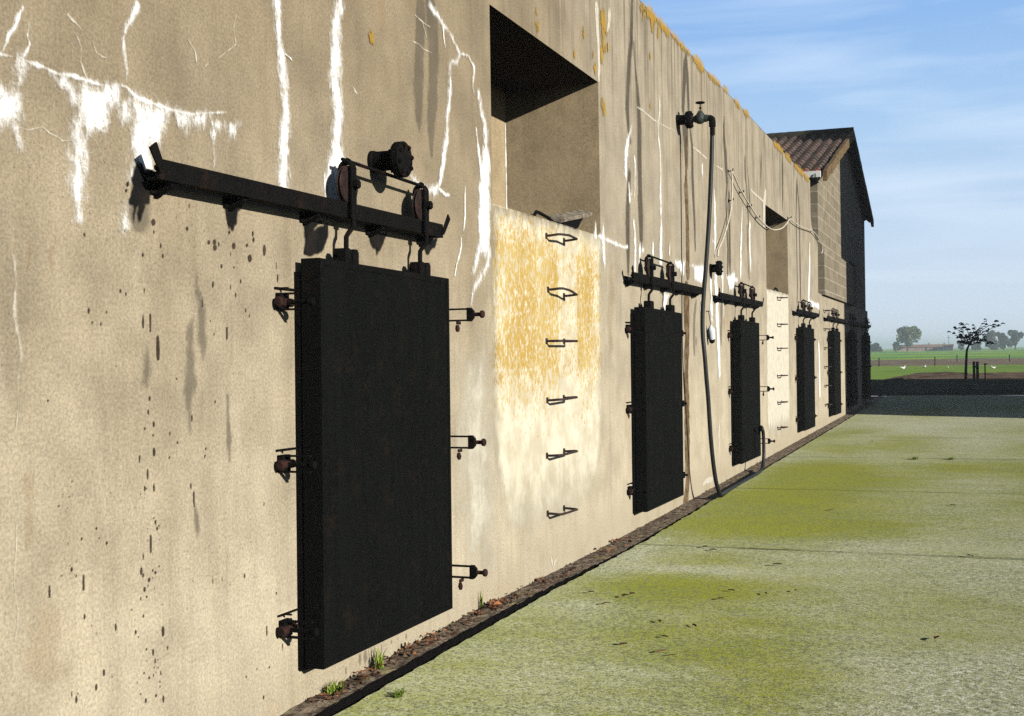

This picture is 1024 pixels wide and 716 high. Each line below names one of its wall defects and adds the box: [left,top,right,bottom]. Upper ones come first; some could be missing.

leakage [0,85,21,141]
leakage [17,58,236,236]
leakage [204,230,266,262]
leakage [273,0,292,188]
leakage [324,0,344,200]
leakage [472,91,491,297]
leakage [142,313,160,360]